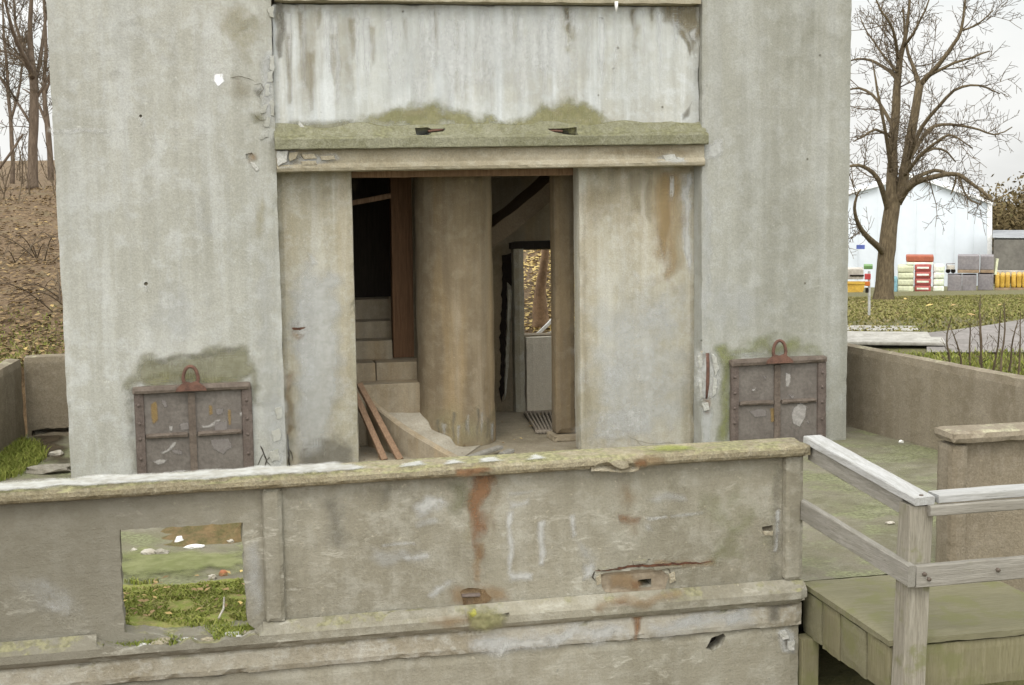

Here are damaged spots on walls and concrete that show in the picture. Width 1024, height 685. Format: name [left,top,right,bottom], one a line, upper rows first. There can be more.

water stain [421,7,575,92]
water stain [651,6,700,45]
spalling [214,55,275,140]
water stain [127,347,256,388]
spalling [697,340,719,413]
corrosion [457,468,492,537]
spalling [596,569,676,593]